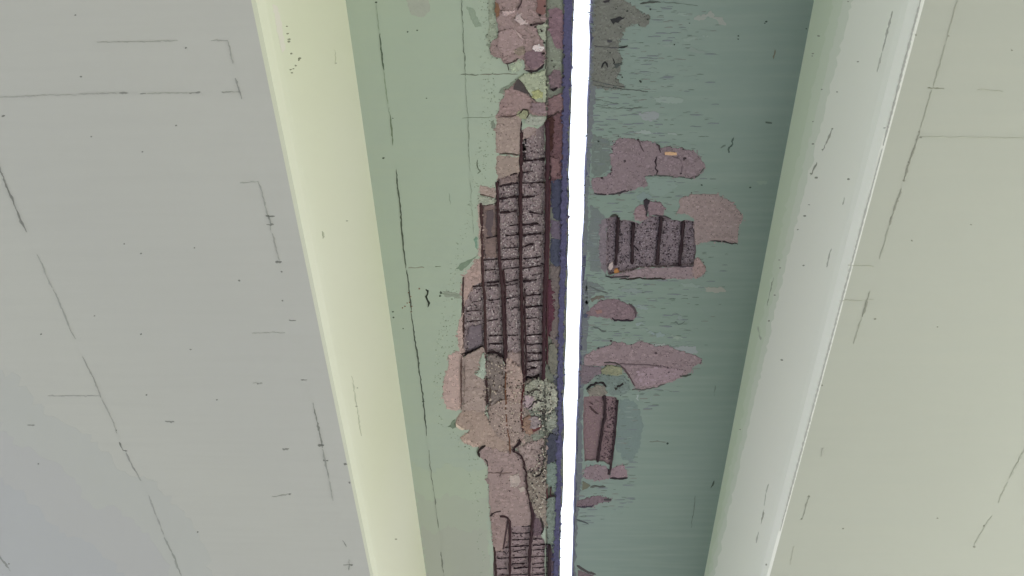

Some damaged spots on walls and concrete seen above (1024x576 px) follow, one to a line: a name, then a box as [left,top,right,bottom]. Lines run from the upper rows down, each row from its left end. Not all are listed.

crack [240,181,281,263]
spalling [441,0,566,576]
spalling [586,299,638,322]
spalling [590,136,745,280]
crack [37,255,182,576]
spalling [578,339,703,482]